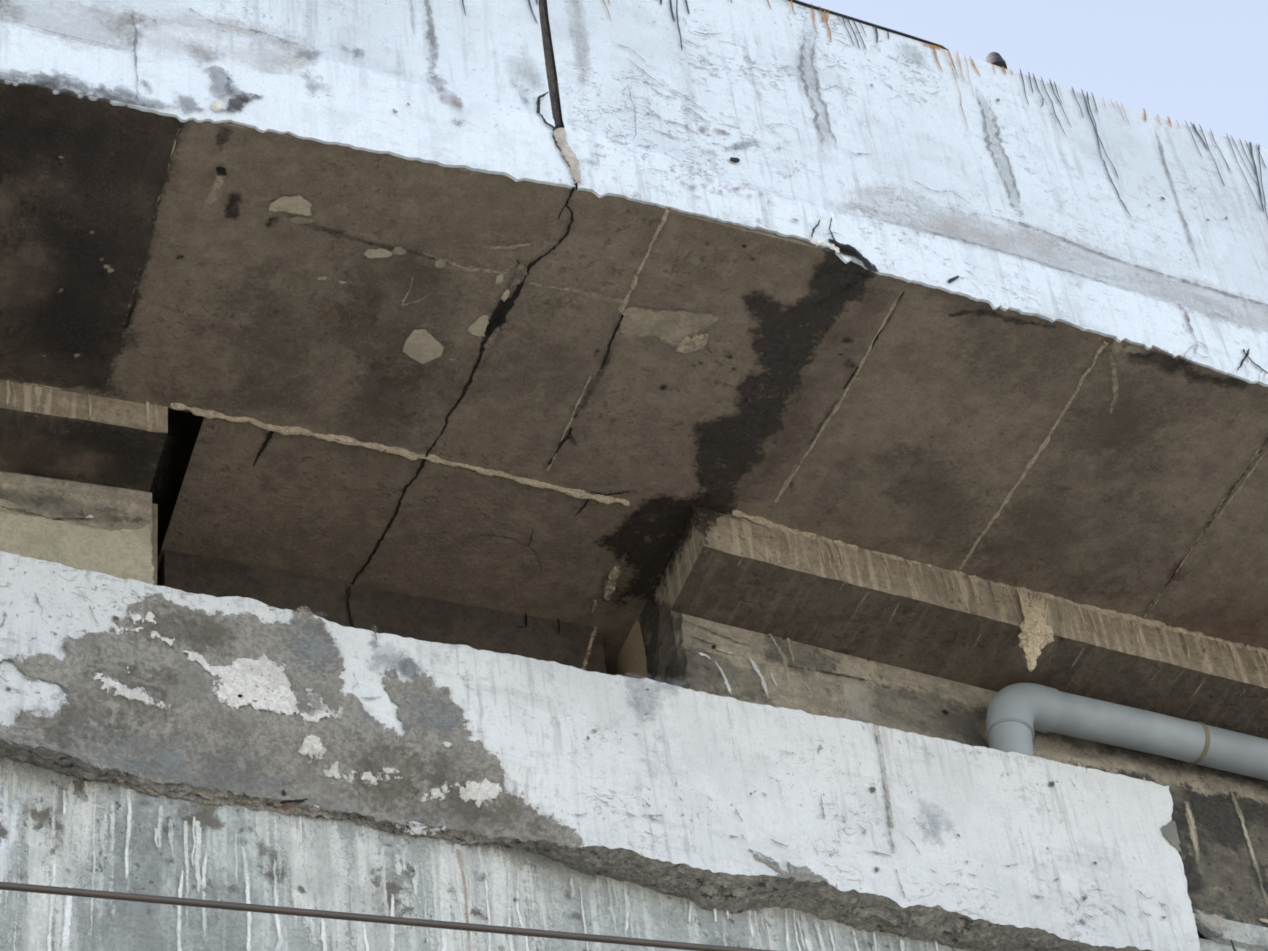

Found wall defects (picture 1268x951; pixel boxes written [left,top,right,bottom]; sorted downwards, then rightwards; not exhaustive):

corrosion [811,4,831,41]
corrosion [923,43,980,75]
spalling [266,195,314,227]
crack [253,431,274,466]
spalling [402,329,456,364]
crack [294,92,630,628]
leakage [594,242,874,606]
peeling [0,593,584,850]
leakage [0,756,132,951]
leakage [154,805,208,951]
leakage [247,810,589,951]
spalling [749,849,836,887]